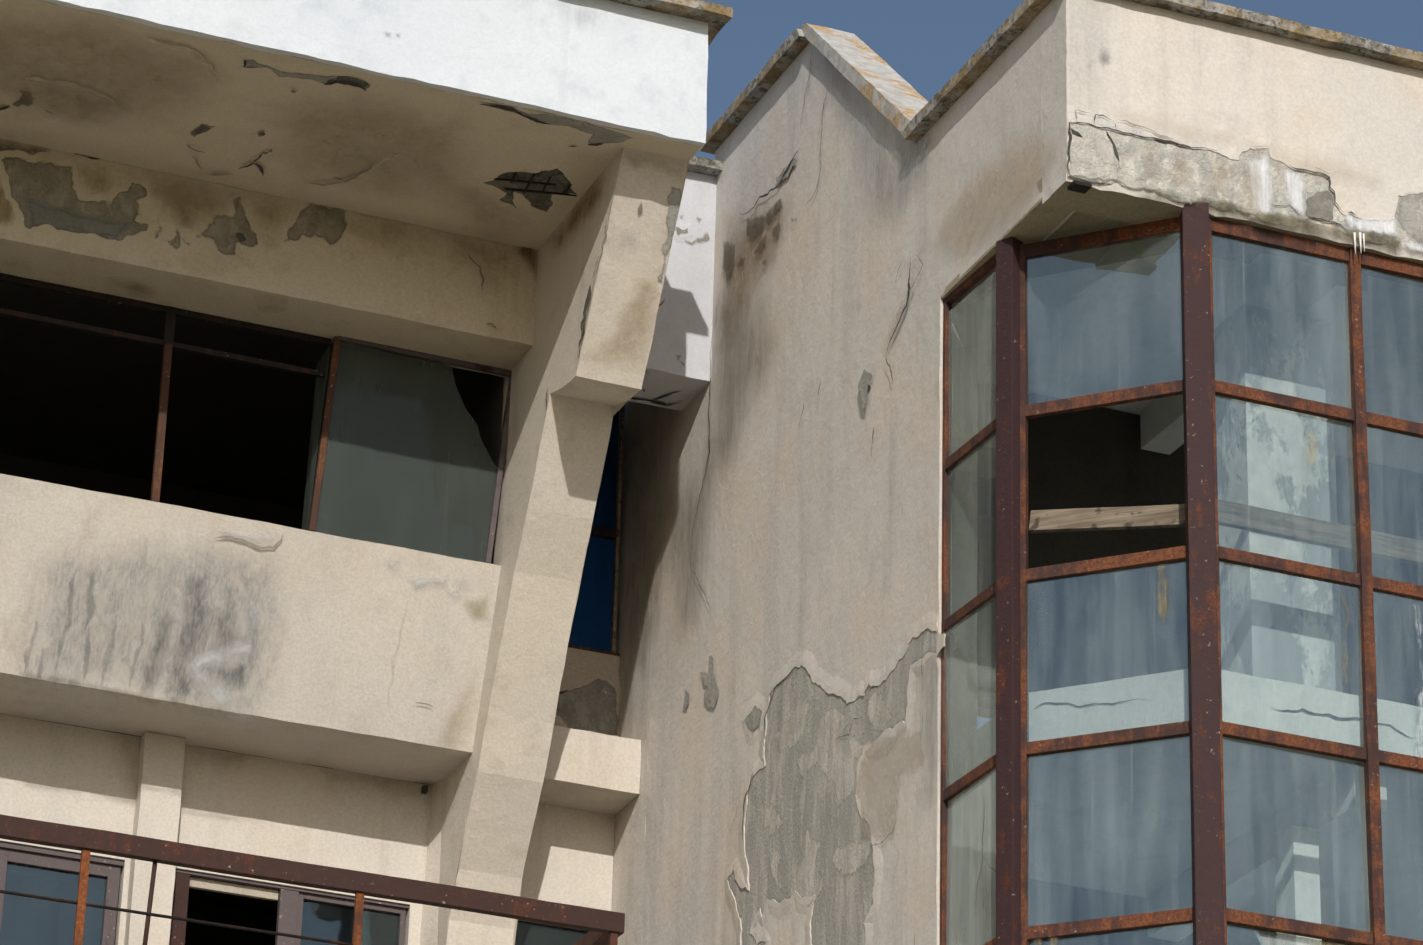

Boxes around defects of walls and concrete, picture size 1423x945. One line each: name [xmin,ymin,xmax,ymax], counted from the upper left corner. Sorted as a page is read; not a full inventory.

flaking render [0,143,362,267]
spalling [472,104,646,216]
crack [739,53,827,215]
flaking render [1067,108,1423,253]
damp [148,574,250,702]
flaking render [554,667,620,737]
flaking render [724,612,946,945]